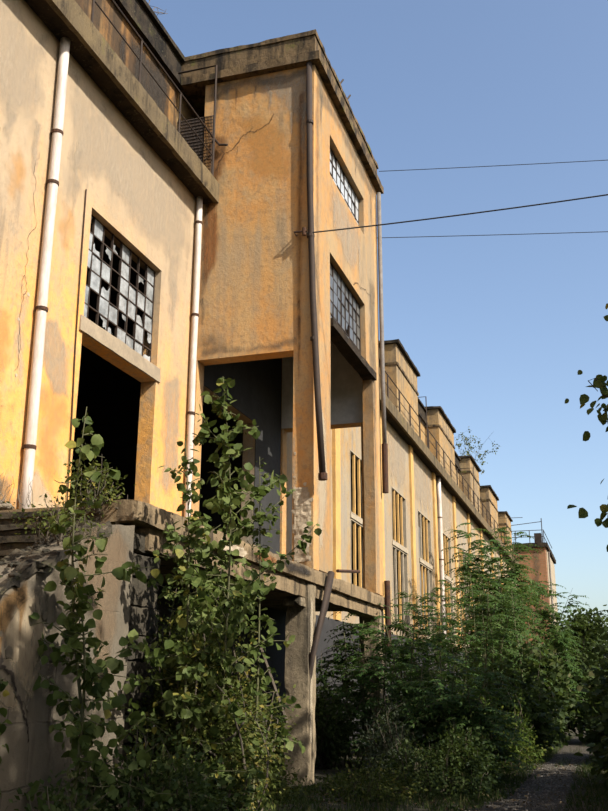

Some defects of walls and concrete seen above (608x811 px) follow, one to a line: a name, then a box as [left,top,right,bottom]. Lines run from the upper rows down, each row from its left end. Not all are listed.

crack [215,114,274,171]
spalling [291,413,327,562]
corrosion [0,585,27,651]
crack [0,651,29,742]